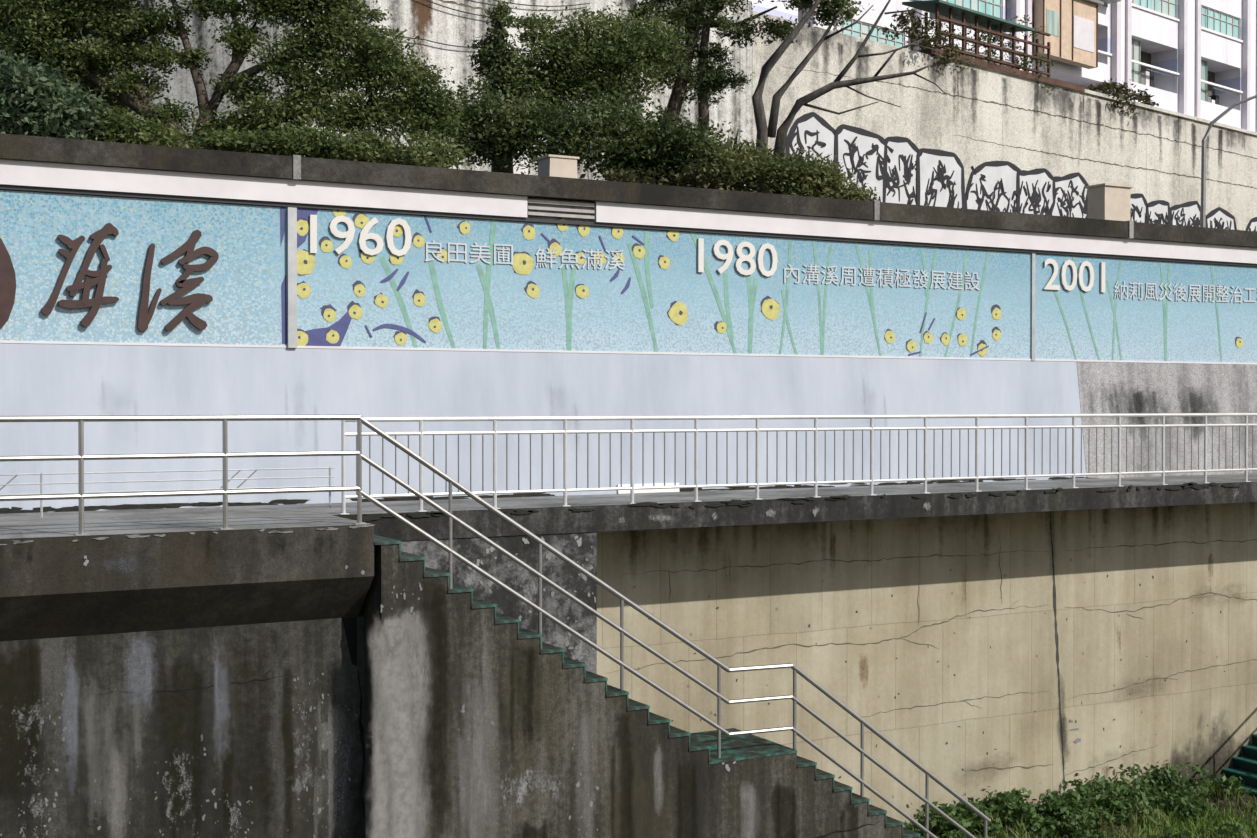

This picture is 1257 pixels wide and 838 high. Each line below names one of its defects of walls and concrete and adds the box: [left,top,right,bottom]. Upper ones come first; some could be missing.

water stain [412,0,432,57]
water stain [1182,399,1209,432]
water stain [464,566,493,593]
water stain [565,617,594,668]
crack [611,511,1257,792]
water stain [63,641,152,838]
water stain [194,664,234,814]
water stain [283,670,294,833]
water stain [315,706,349,837]
water stain [458,651,558,838]